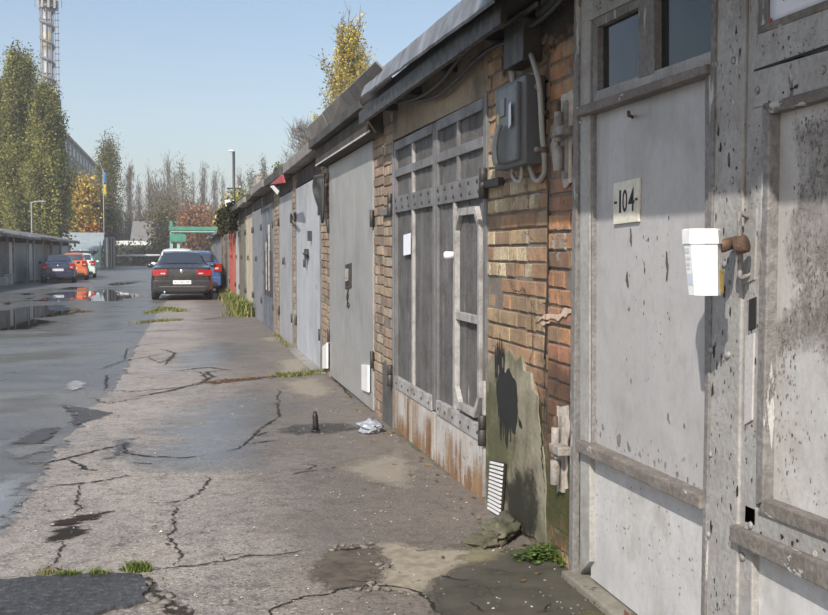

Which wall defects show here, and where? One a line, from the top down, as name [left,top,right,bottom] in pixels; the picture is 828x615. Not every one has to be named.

peeling [775,107,828,475]
crack [89,320,228,403]
crack [37,541,67,576]
crack [18,442,196,514]
crack [148,476,300,569]
crack [227,374,308,451]
crack [268,580,442,615]
corrosion [394,398,484,502]
peeling [309,541,605,615]
water stain [506,470,538,537]